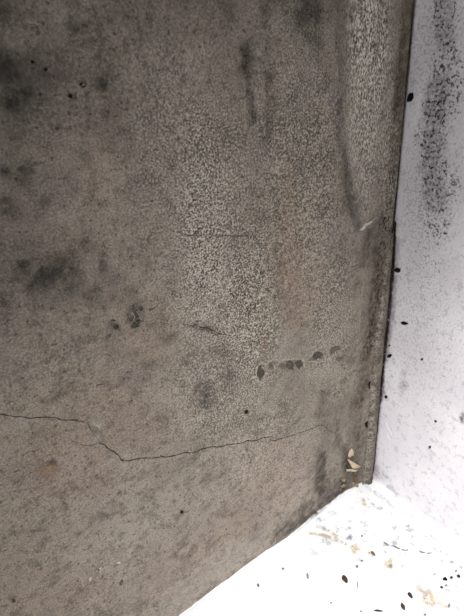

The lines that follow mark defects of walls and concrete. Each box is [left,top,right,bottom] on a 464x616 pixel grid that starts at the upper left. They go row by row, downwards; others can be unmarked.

damp [414,1,464,245]
crack [0,414,332,461]